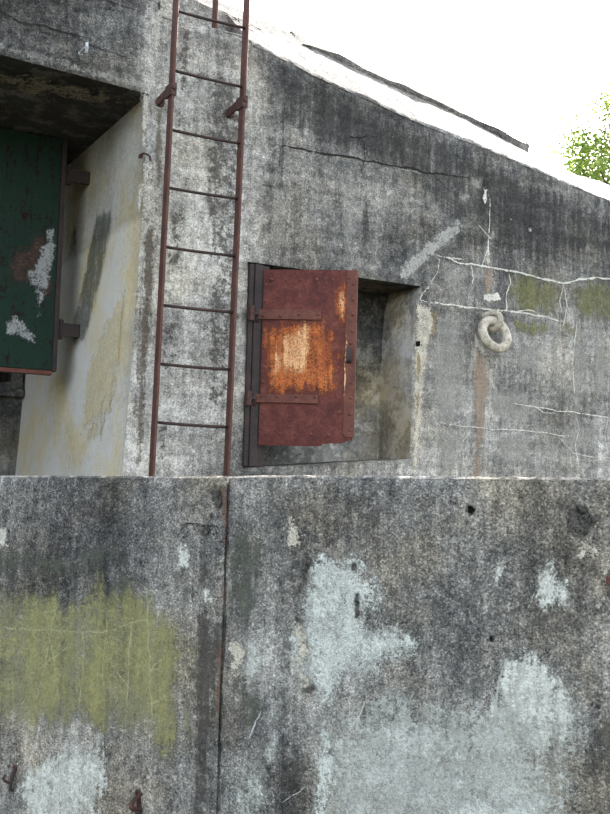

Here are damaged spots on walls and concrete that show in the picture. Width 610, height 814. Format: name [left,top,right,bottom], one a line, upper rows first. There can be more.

crack [0,11,134,60]
crack [277,135,468,190]
peeling [9,227,56,317]
peeling [6,315,35,343]
rust [263,319,347,395]
rust [336,283,347,323]
crack [420,211,610,460]
water stain [0,528,126,577]
water stain [284,515,303,549]
water stain [576,541,610,586]
water stain [291,617,312,700]
water stain [585,709,610,782]